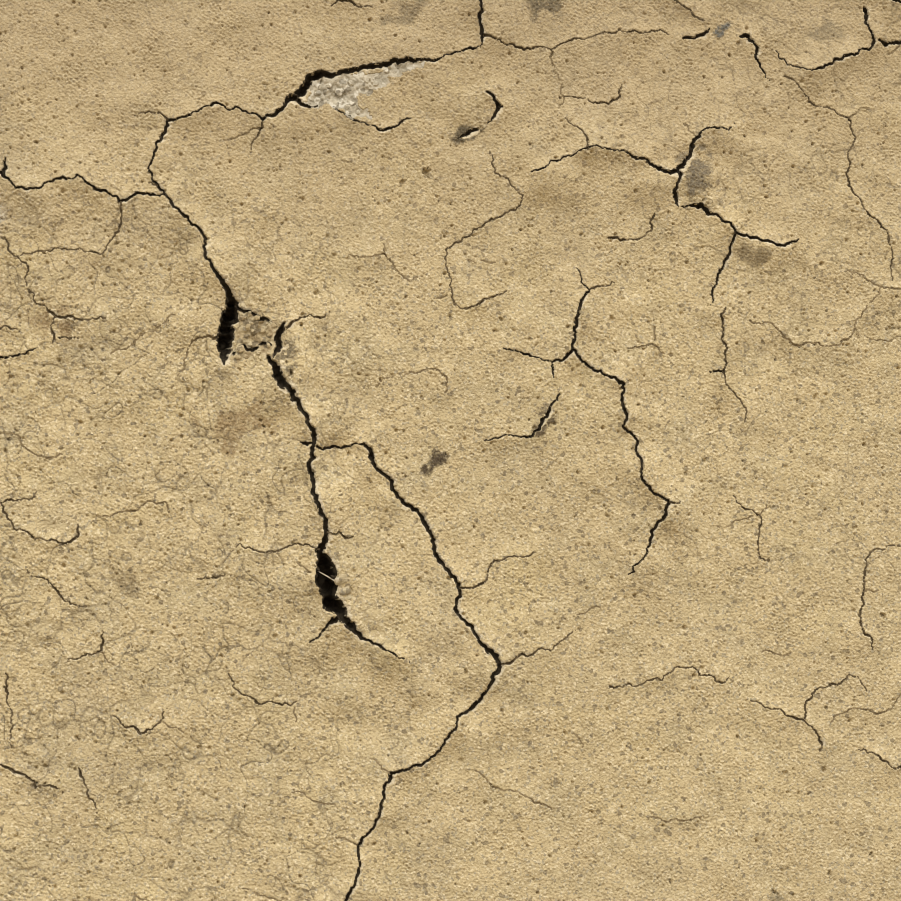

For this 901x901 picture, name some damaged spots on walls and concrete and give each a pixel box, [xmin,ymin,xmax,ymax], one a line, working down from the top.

crack [682,28,710,40]
flaking render [304,61,425,120]
crack [531,114,799,305]
crack [739,8,901,347]
crack [709,307,748,435]
crack [0,0,681,901]
crack [717,495,770,561]
crack [859,545,901,654]
crack [609,666,730,689]
crack [750,674,901,752]
crack [858,748,901,770]
crack [650,815,701,823]